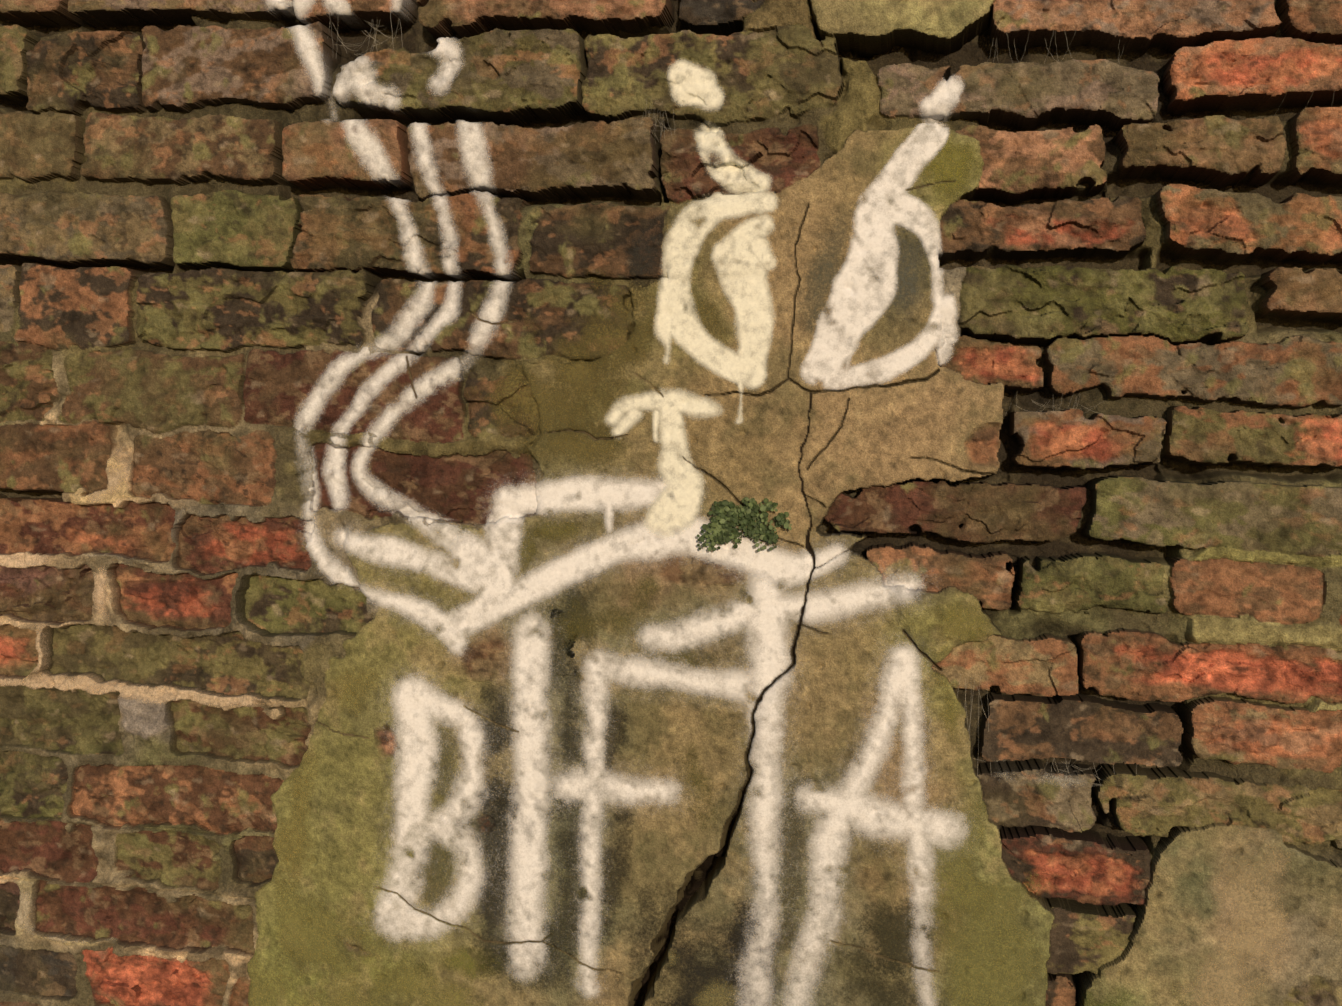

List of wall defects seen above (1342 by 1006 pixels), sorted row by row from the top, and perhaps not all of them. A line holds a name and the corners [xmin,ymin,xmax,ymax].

crack [910,457,995,477]
spalling [963,422,1003,470]
spalling [1028,421,1136,466]
spalling [1284,415,1342,468]
spalling [197,521,312,568]
spalling [120,577,222,623]
crack [376,203,943,1006]
spalling [1113,642,1342,702]
spalling [1195,714,1342,764]
spalling [1022,844,1148,900]
spalling [90,957,217,1006]
spalling [1282,975,1341,1006]